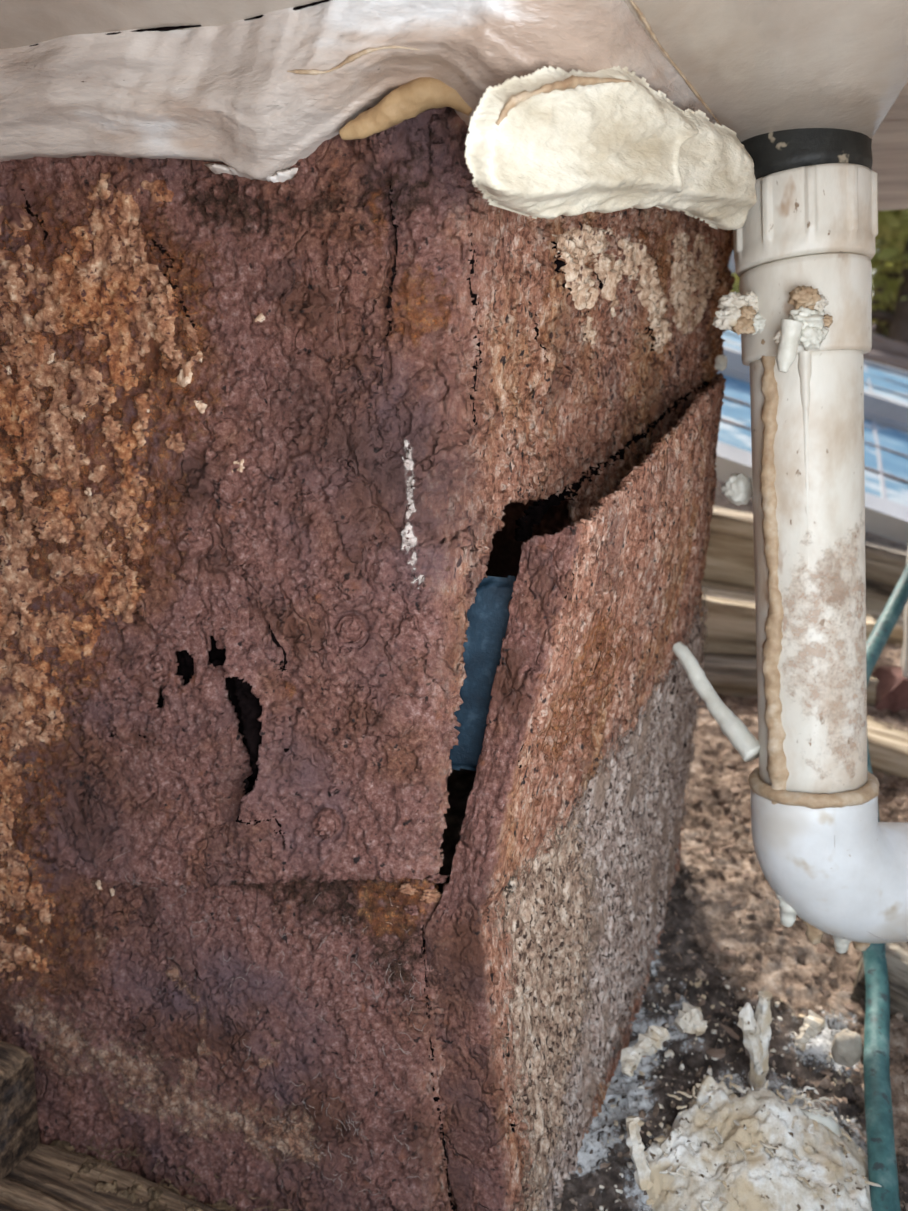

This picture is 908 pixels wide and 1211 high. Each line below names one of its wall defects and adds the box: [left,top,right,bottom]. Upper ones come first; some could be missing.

crack [514,379,712,541]
crack [421,924,457,1210]
crack [503,1022,511,1057]
crack [508,1101,516,1133]